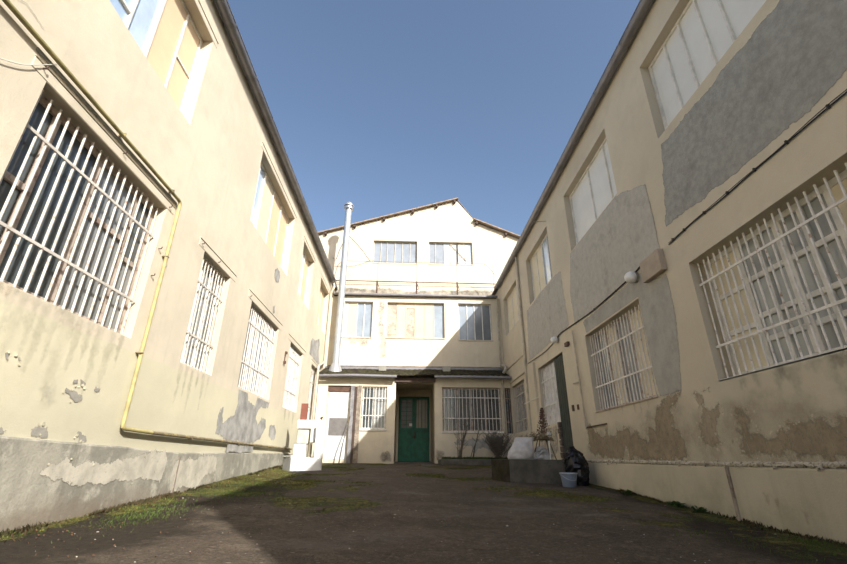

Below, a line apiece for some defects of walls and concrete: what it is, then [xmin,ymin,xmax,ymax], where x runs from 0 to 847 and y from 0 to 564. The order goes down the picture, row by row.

peeling [63,379,100,402]
peeling [215,390,276,454]
peeling [586,391,847,471]
peeling [40,450,217,492]